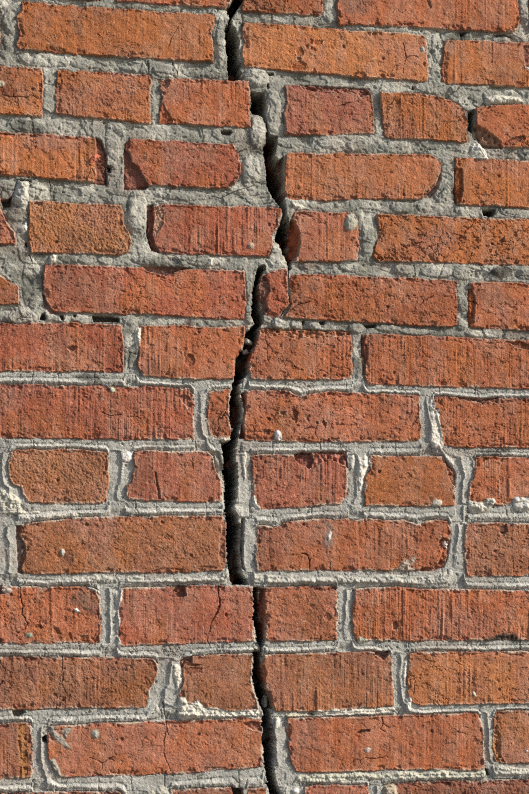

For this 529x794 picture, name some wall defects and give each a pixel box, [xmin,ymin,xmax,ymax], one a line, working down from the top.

crack [207,0,312,794]